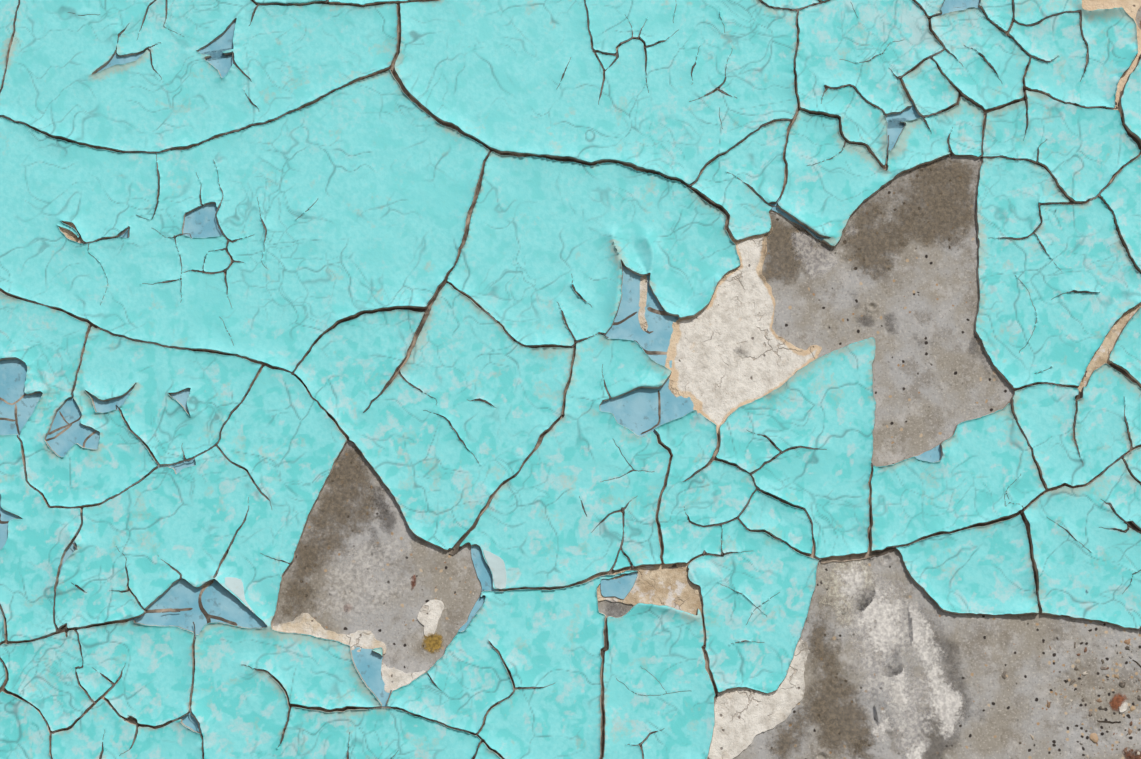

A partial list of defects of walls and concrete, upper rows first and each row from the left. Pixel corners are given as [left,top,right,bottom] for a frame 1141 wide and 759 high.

peeling [1076,0,1141,117]
crack [0,0,1141,577]
peeling [599,155,1015,466]
peeling [0,359,42,438]
peeling [46,395,100,457]
crack [0,546,204,759]
peeling [129,441,507,707]
crack [245,642,554,759]
crack [600,616,683,759]
crack [701,584,780,696]
peeling [708,547,1141,759]